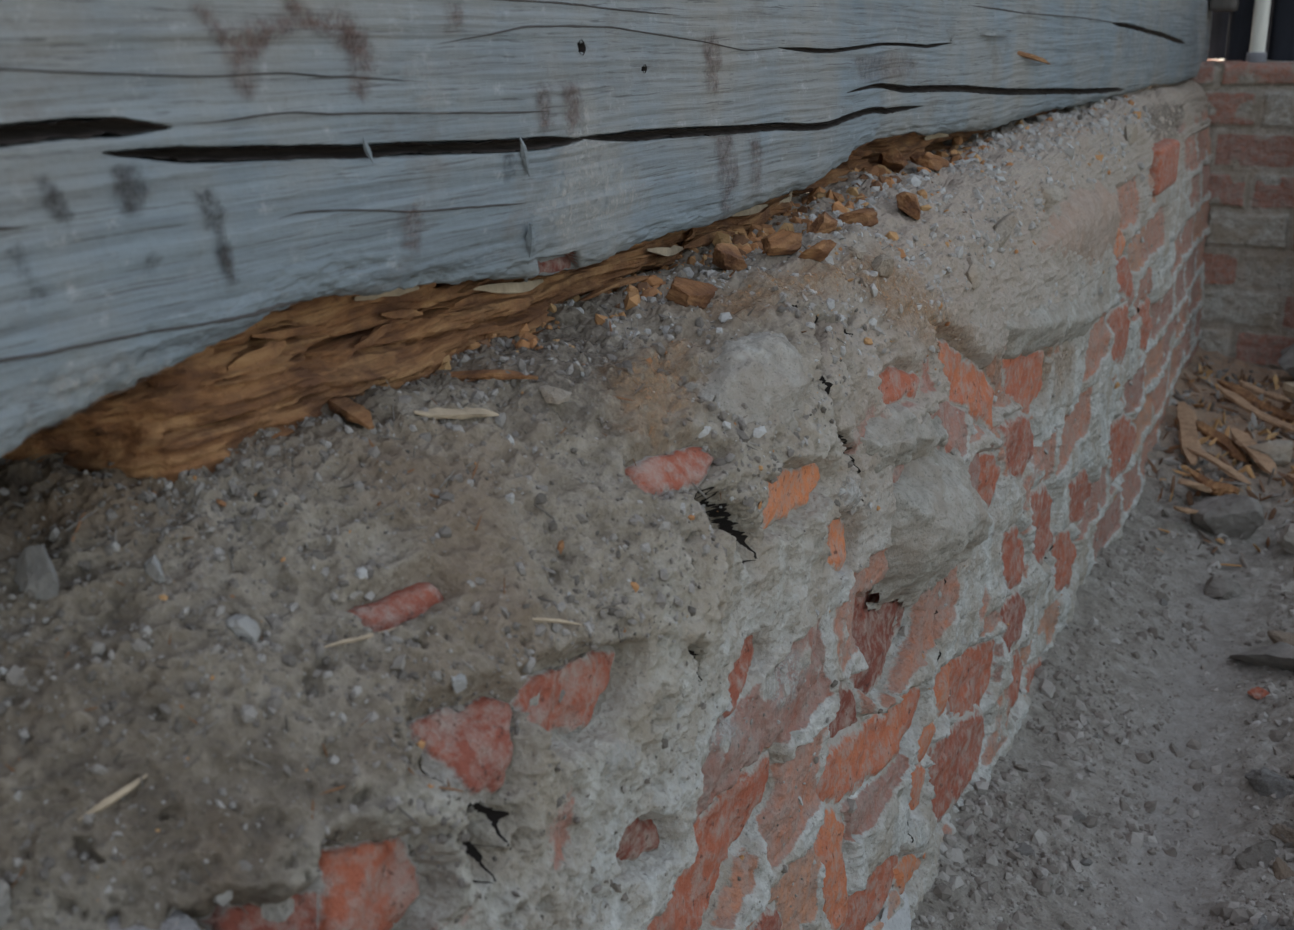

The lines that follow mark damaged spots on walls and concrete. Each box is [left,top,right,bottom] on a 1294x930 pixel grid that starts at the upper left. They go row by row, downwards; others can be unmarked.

spalling [1105,228,1153,365]
spalling [625,446,714,497]
crack [694,487,757,564]
spalling [760,463,820,529]
spalling [1109,411,1137,484]
spalling [347,582,444,632]
spalling [814,337,1091,930]
spalling [722,635,754,719]
spalling [406,645,615,806]
spalling [191,833,422,930]
spalling [616,817,660,861]
spalling [647,750,769,930]